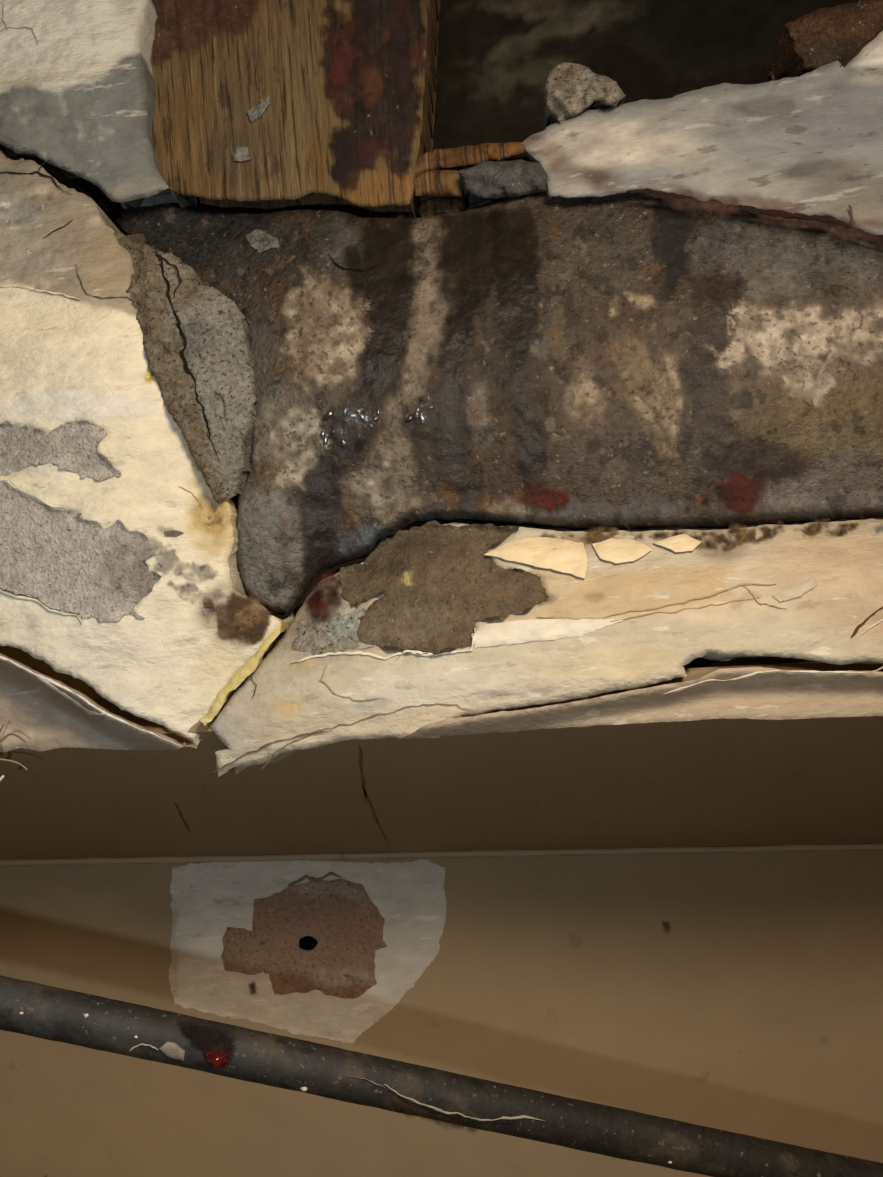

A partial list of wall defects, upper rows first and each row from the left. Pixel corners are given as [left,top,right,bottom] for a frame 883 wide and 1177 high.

rust [321,0,429,189]
crack [149,241,226,462]
damp [280,219,416,399]
damp [610,199,883,478]
crack [0,645,103,699]
spalling [0,420,183,622]
damp [262,408,393,567]
crack [214,645,477,843]
spalling [290,520,775,663]
crack [185,517,883,749]
damp [639,522,783,551]
spalling [221,872,387,999]